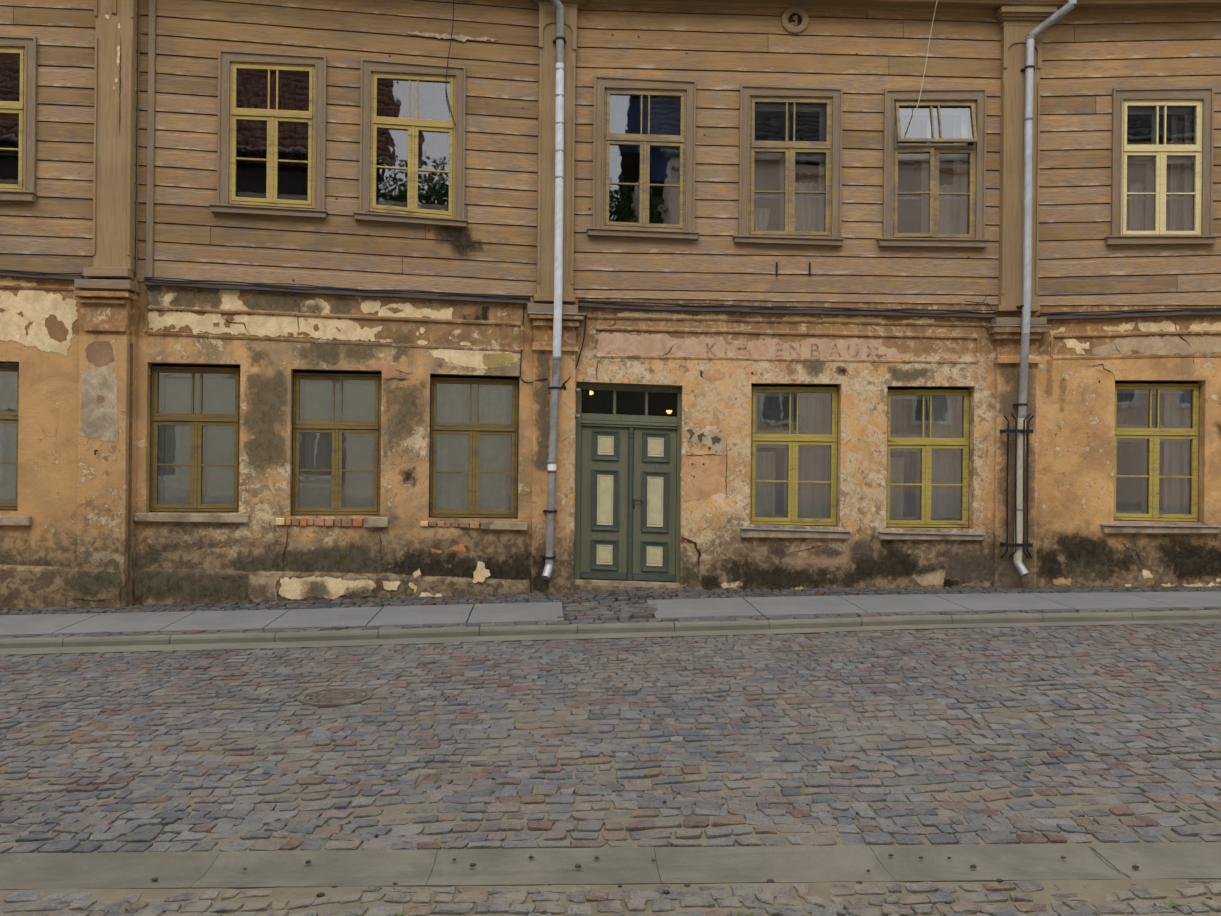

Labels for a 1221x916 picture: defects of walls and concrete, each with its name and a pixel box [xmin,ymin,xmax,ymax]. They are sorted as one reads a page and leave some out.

peeling [0,277,78,356]
peeling [148,290,513,369]
water stain [300,343,375,365]
water stain [393,336,409,361]
peeling [1049,320,1221,356]
flaking render [79,341,119,442]
water stain [244,347,288,469]
water stain [682,360,1221,591]
water stain [234,553,286,572]
flaking render [247,564,442,602]
water stain [387,552,549,591]
flaking render [472,561,490,583]